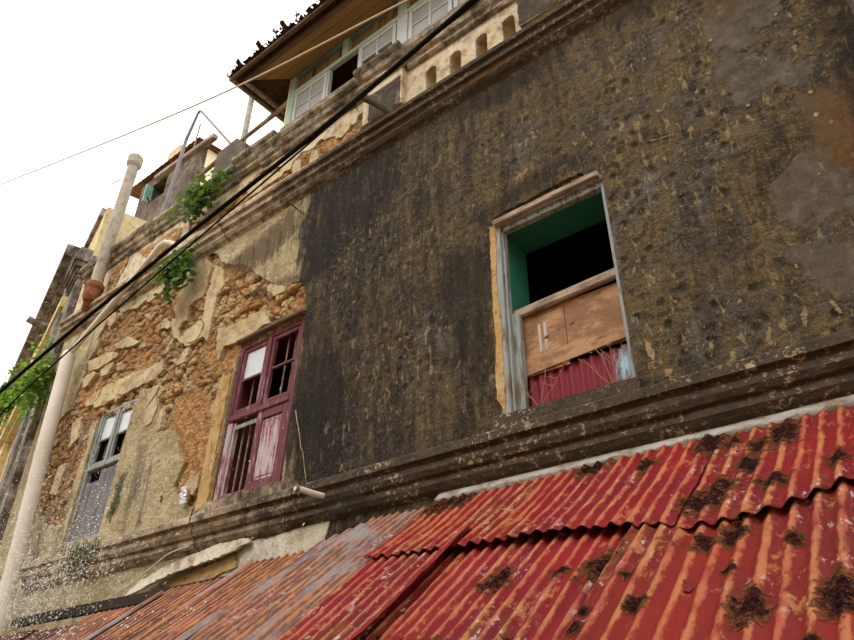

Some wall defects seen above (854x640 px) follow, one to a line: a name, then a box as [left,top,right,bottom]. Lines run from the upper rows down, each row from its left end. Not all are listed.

spalling [37,253,306,527]
rust [567,457,616,483]
rust [823,444,854,469]
rust [420,492,482,517]
rust [670,417,803,575]
rust [782,525,808,548]
rust [468,565,525,598]
rust [543,539,635,588]
rust [563,603,592,640]
rust [619,593,652,616]
rust [720,580,777,632]
rust [799,561,854,640]